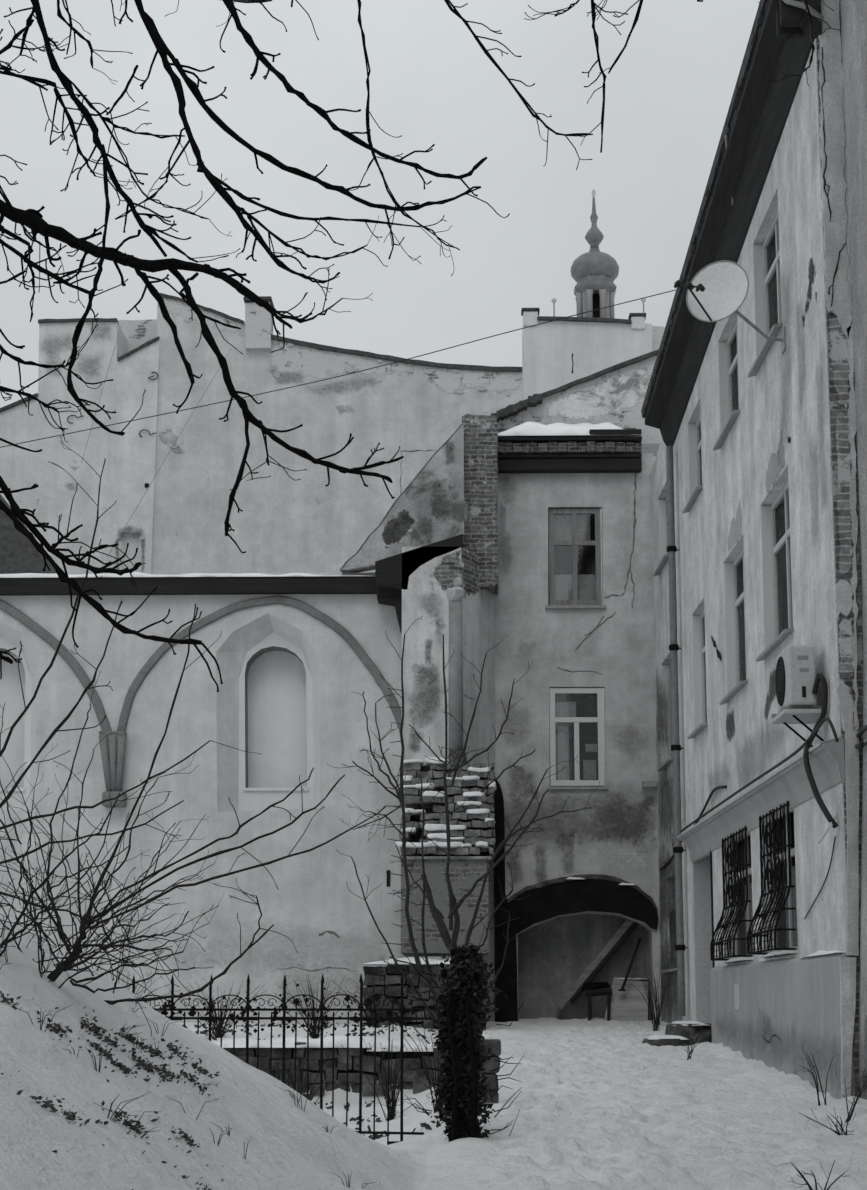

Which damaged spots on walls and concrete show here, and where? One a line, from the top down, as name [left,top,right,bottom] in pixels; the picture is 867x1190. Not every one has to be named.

crack [821,47,850,306]
flaking render [269,339,651,423]
flaking render [828,313,852,574]
flaking render [428,544,492,598]
crack [557,473,637,675]
leakage [415,642,438,720]
flaking render [836,618,854,680]